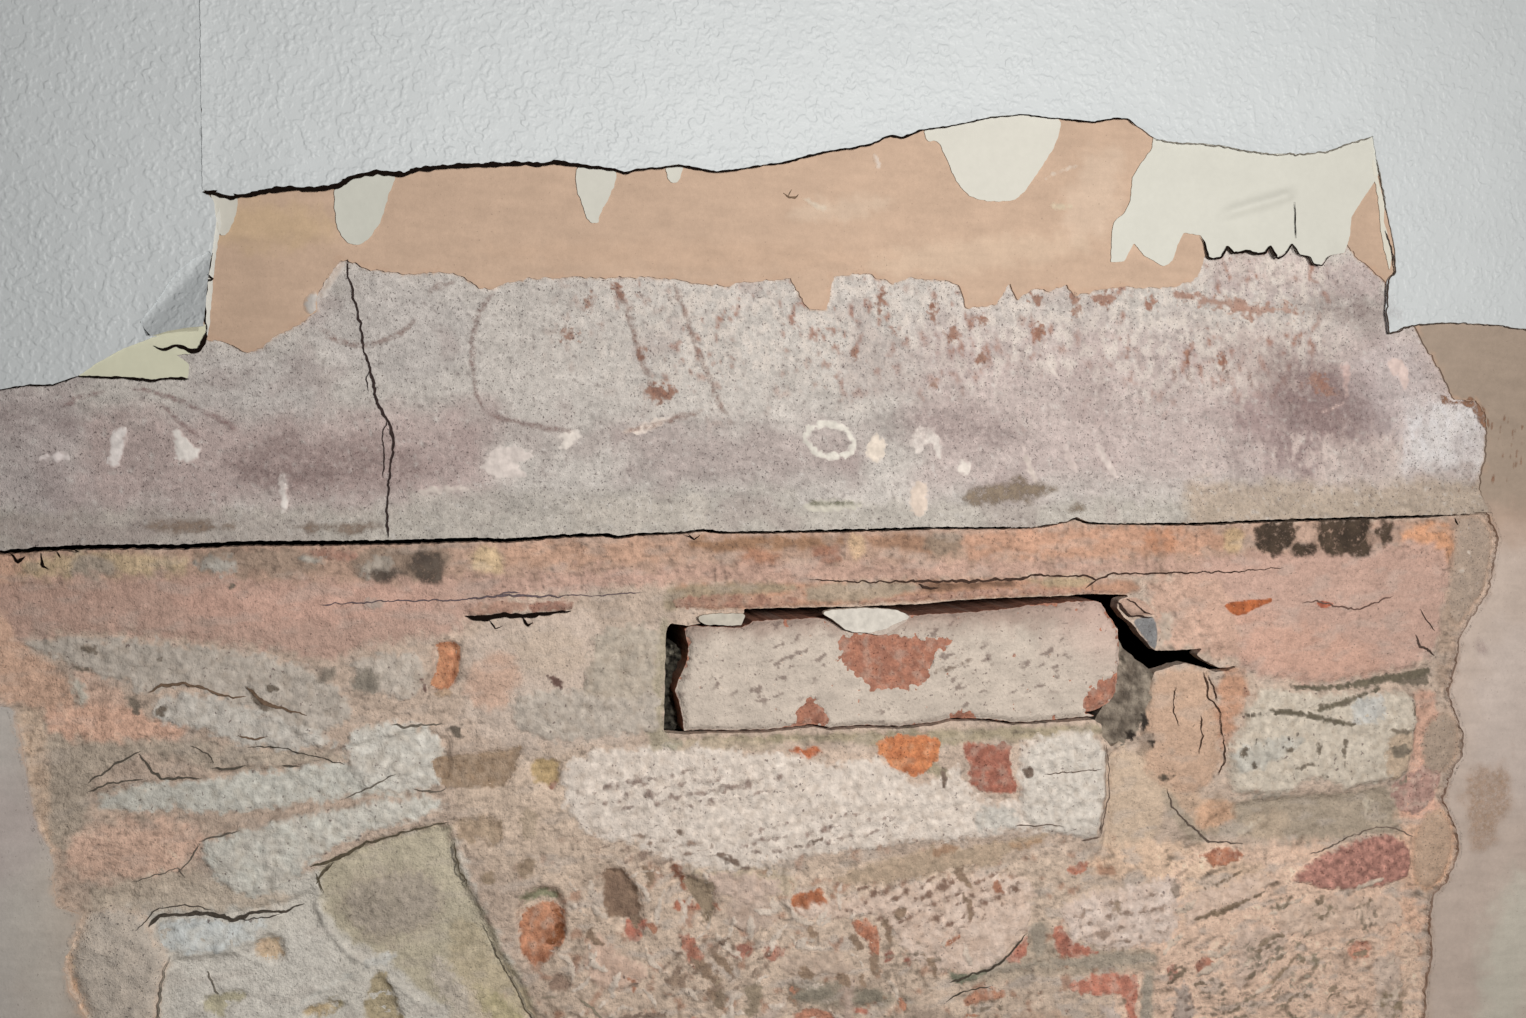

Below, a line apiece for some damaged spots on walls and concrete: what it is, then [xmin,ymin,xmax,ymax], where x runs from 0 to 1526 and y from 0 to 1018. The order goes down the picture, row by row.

crack [0,253,1458,569]
spalling [0,245,1503,1018]
crack [88,682,469,930]
crack [157,958,170,1018]